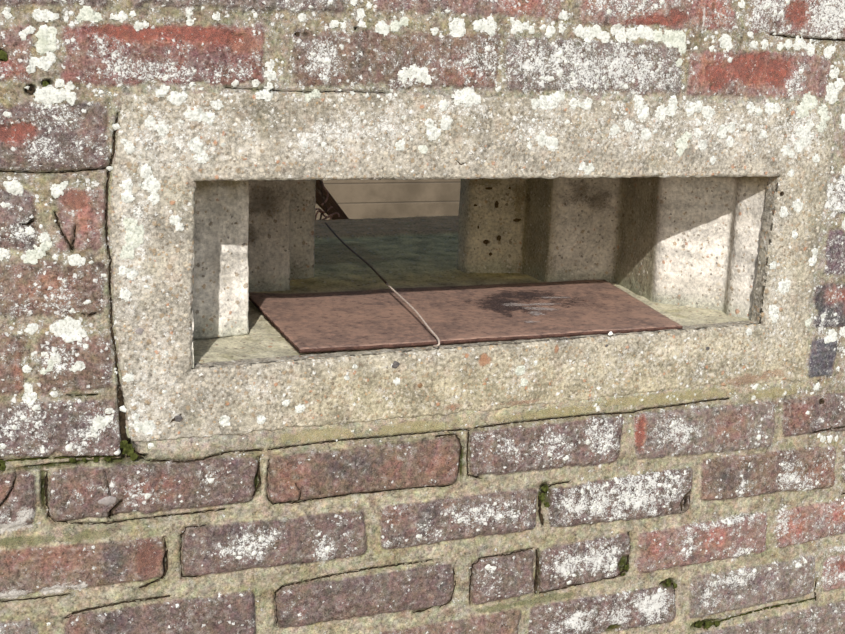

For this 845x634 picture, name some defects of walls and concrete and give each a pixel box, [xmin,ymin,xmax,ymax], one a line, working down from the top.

crack [0,116,730,626]